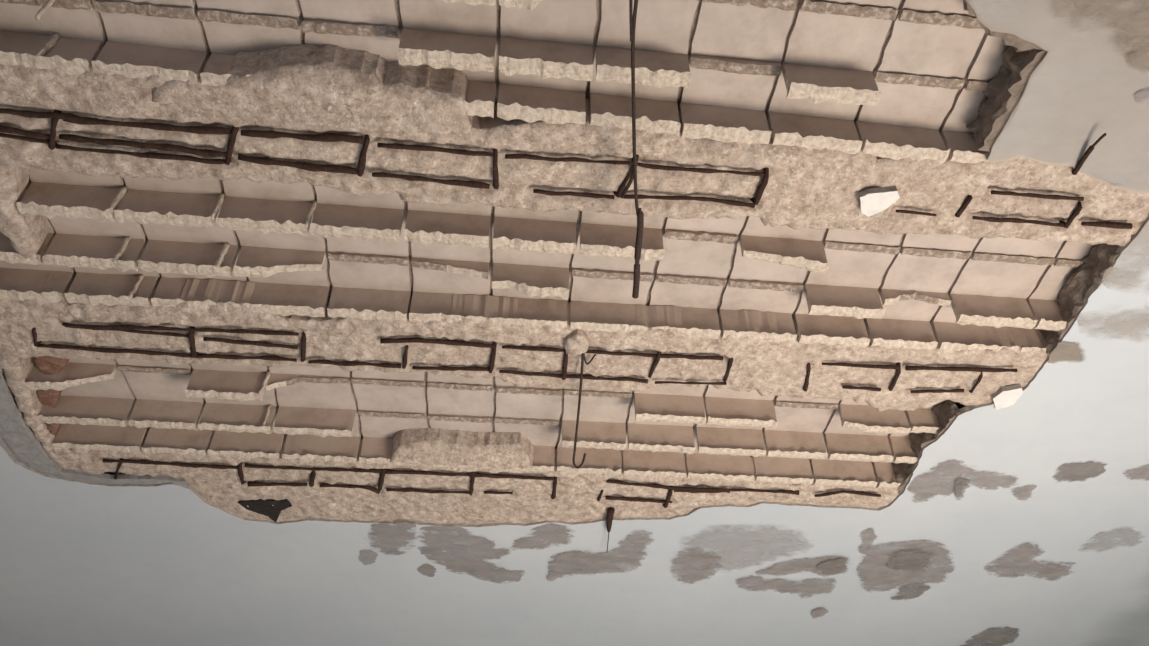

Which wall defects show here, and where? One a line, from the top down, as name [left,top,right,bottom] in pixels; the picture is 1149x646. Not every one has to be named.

water stain [967,0,1149,194]
spalling [0,108,231,159]
spalling [637,162,765,203]
spalling [64,323,299,336]
spalling [37,344,297,362]
spalling [822,362,900,370]
water stain [1048,342,1083,364]
spalling [427,372,564,472]
spalling [557,389,621,476]
spalling [576,381,966,495]
spalling [244,463,382,473]
spalling [238,499,292,522]